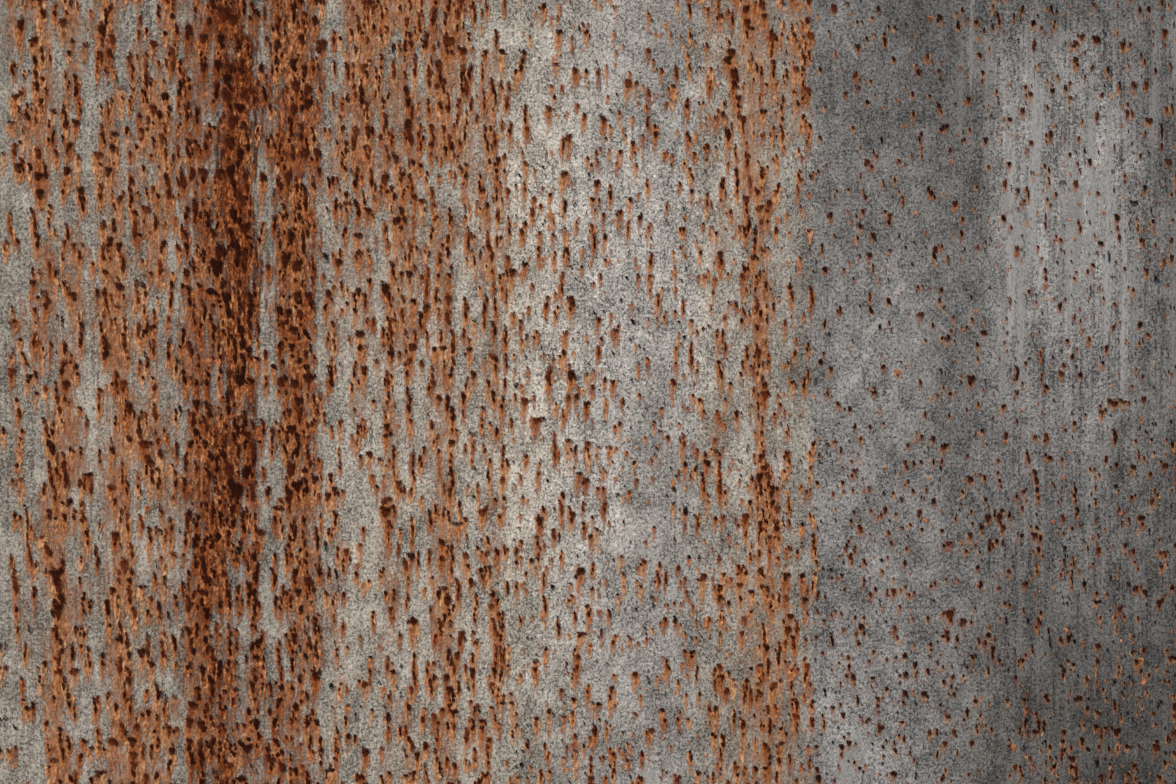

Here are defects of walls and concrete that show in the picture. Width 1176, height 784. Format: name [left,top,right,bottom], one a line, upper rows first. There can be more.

rust [831,0,947,128]
rust [926,0,1176,289]
rust [898,230,949,265]
rust [916,284,992,346]
rust [1007,242,1072,319]
rust [1056,283,1135,346]
rust [1099,305,1175,388]
rust [924,368,994,417]
rust [1088,385,1157,511]
rust [1131,417,1175,467]